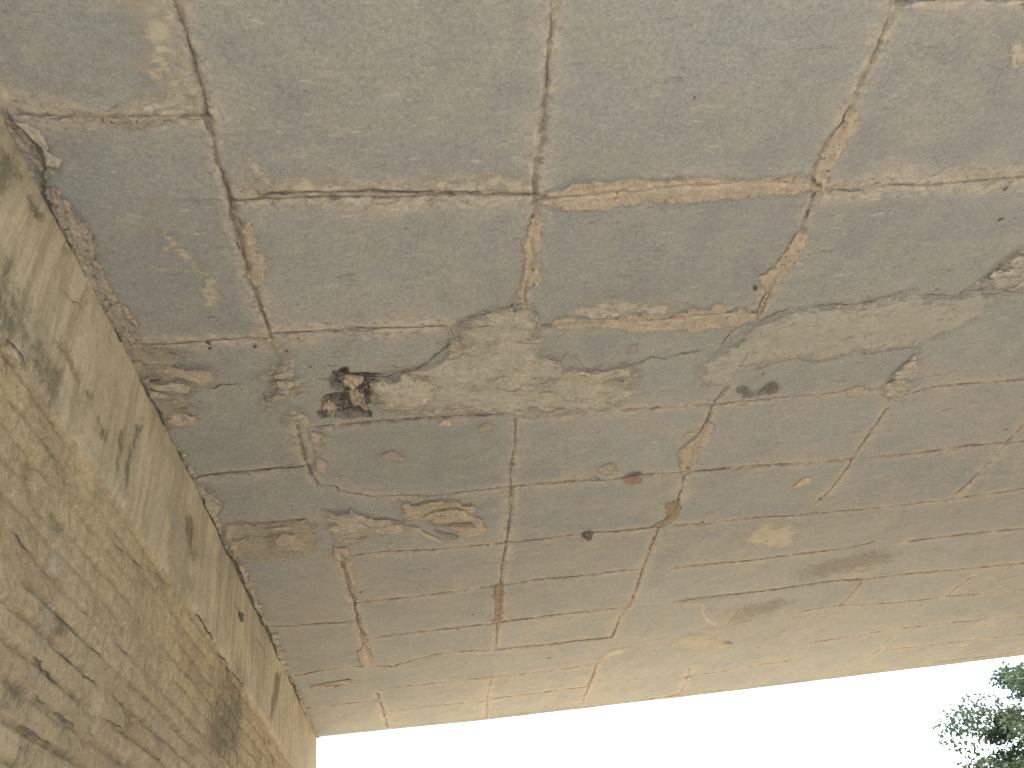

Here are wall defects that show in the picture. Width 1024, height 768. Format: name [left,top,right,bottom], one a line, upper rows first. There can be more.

crack [6,108,72,250]
spalling [8,123,218,428]
crack [357,308,504,379]
crack [620,289,1021,370]
crack [60,290,322,728]
peeling [398,499,487,542]